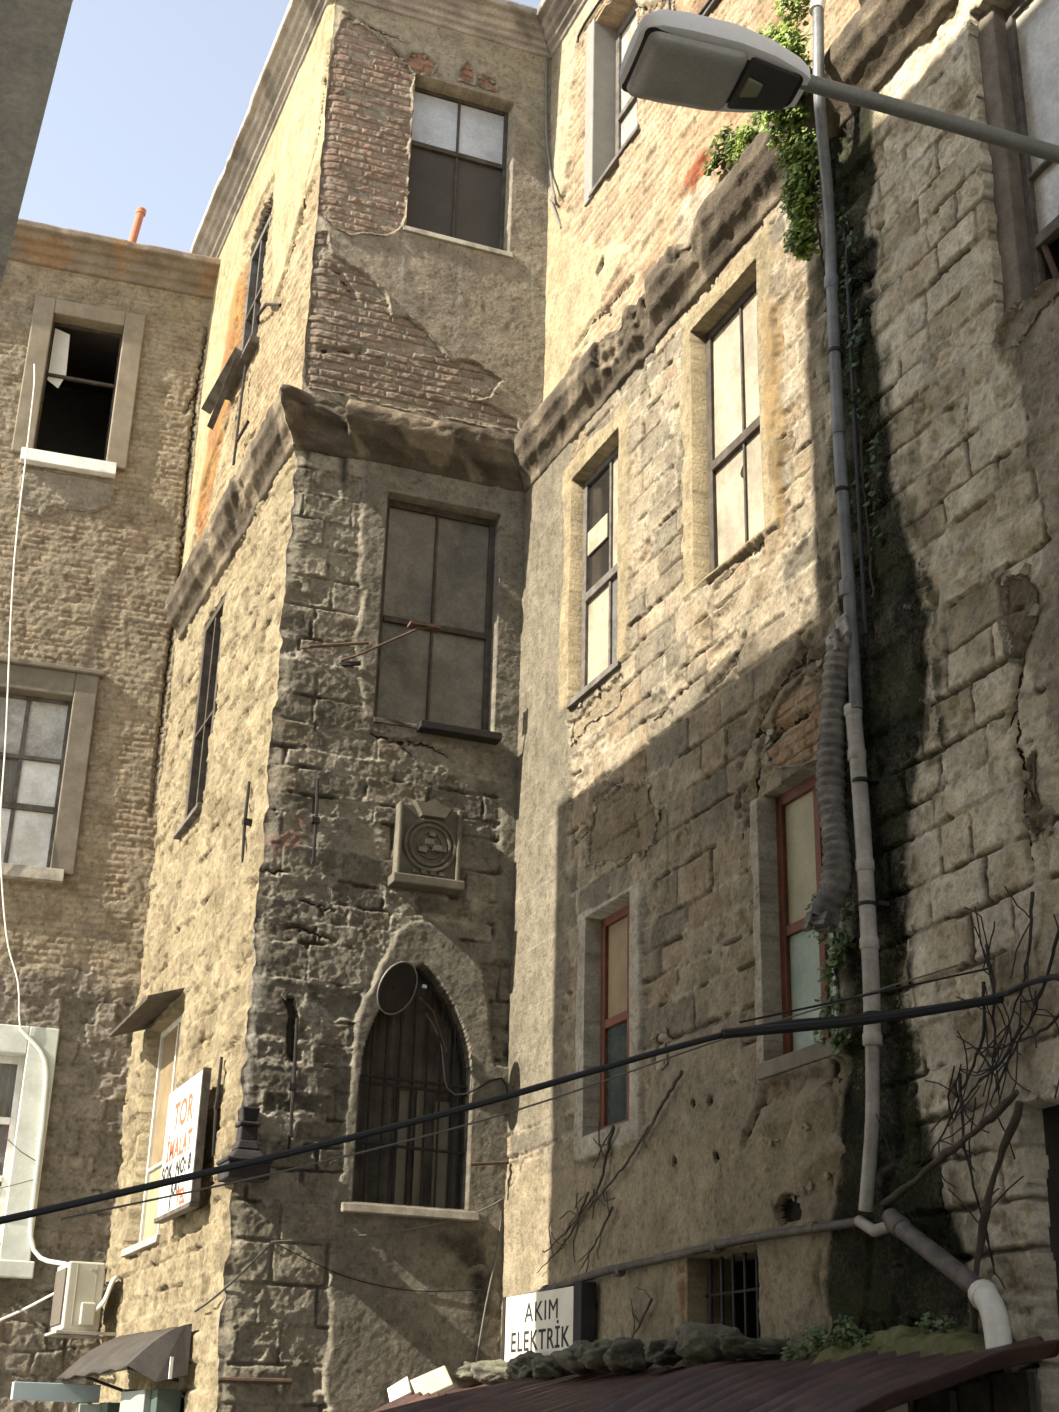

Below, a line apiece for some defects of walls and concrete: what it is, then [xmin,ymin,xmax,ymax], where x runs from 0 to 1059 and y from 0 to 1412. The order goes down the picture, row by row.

spalling [304,14,522,432]
flaking render [17,466,120,517]
spalling [760,658,825,769]
water stain [813,107,984,1346]